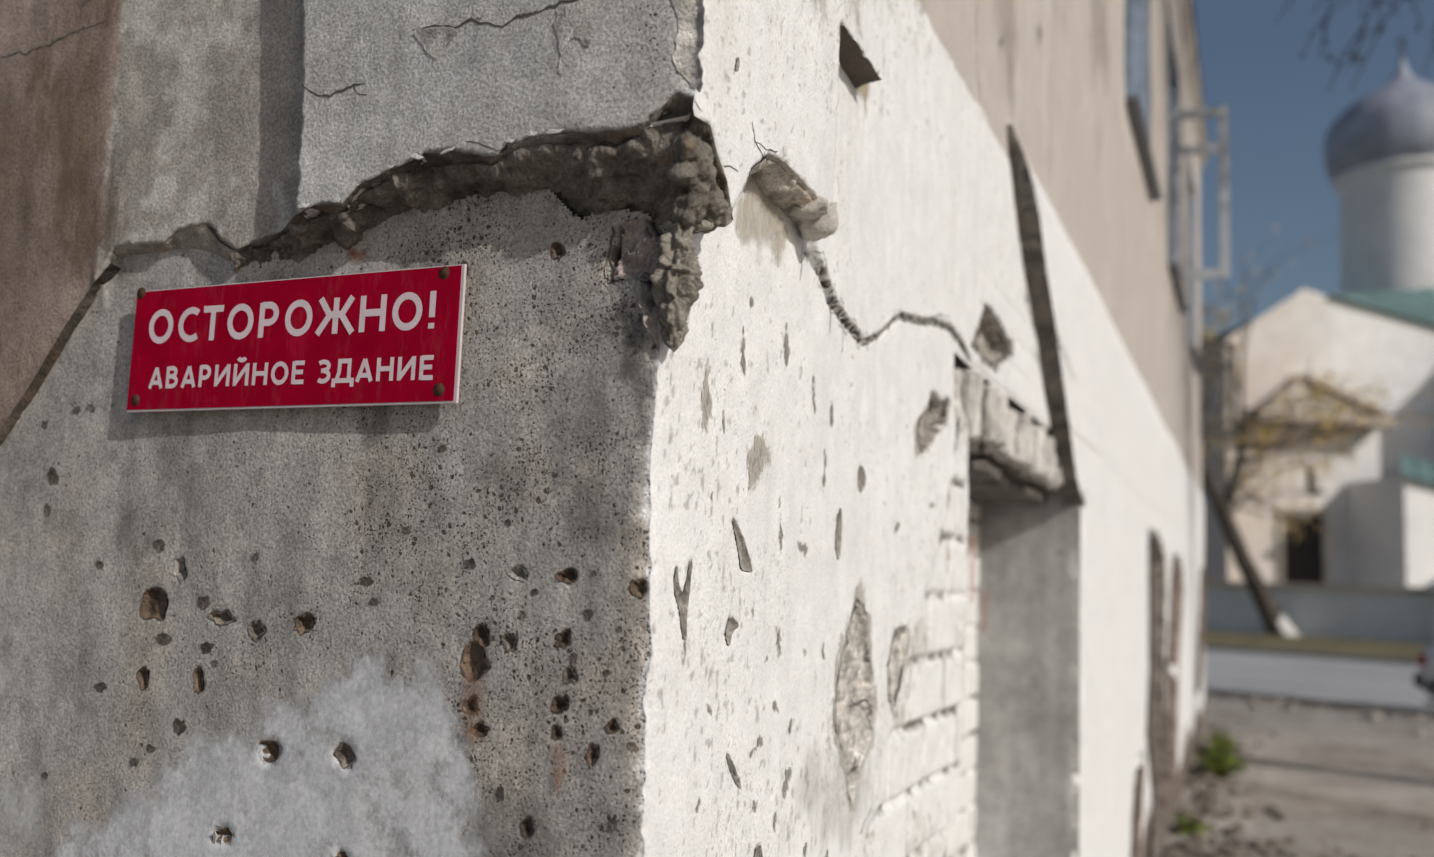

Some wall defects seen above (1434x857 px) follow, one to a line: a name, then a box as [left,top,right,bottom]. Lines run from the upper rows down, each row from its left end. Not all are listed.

crack [412,0,594,30]
flaking render [0,0,733,446]
crack [800,247,972,359]
flaking render [971,306,1013,374]
flaking render [1006,124,1085,507]
spalling [47,467,59,485]
flaking render [804,389,969,857]